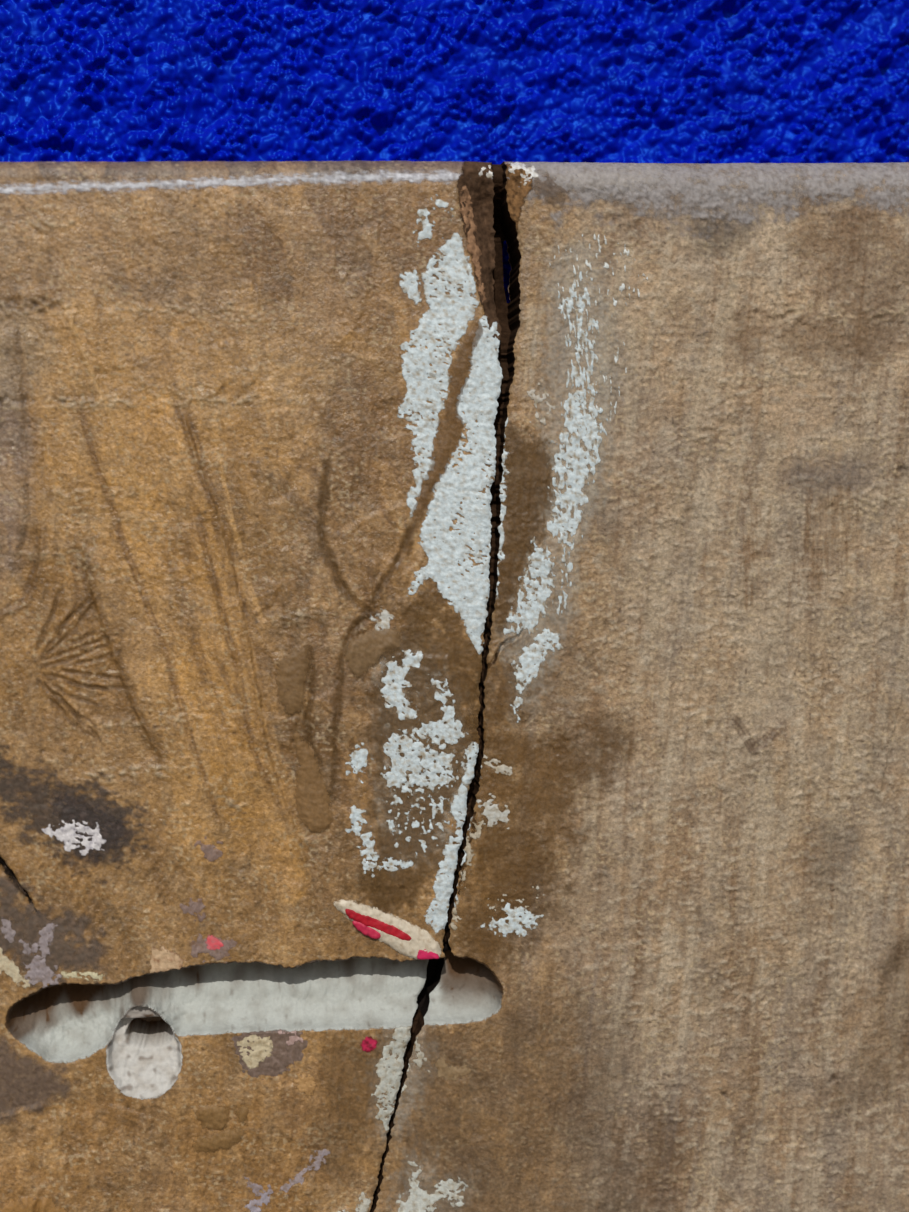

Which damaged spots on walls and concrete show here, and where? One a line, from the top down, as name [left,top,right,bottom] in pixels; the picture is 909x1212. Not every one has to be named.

crack [0,857,40,912]
crack [370,162,523,1212]